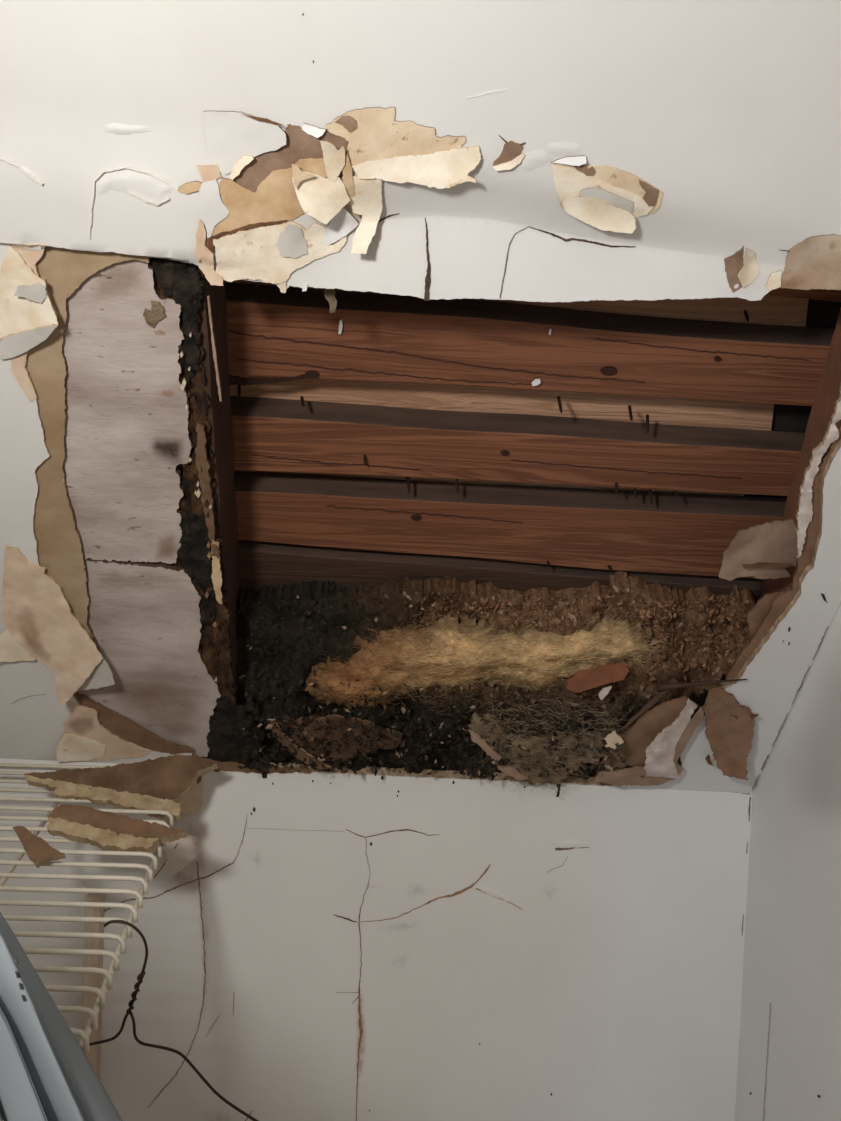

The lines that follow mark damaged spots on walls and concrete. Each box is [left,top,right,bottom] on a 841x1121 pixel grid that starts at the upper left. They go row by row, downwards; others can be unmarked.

peeling [0,244,58,402]
damp [143,257,205,382]
peeling [178,106,526,293]
crack [378,213,431,301]
crack [500,226,635,298]
peeling [550,155,663,233]
spalling [724,234,841,293]
damp [155,443,178,458]
damp [178,510,221,624]
spalling [725,386,841,680]
peeling [0,545,152,763]
crack [104,814,522,1121]